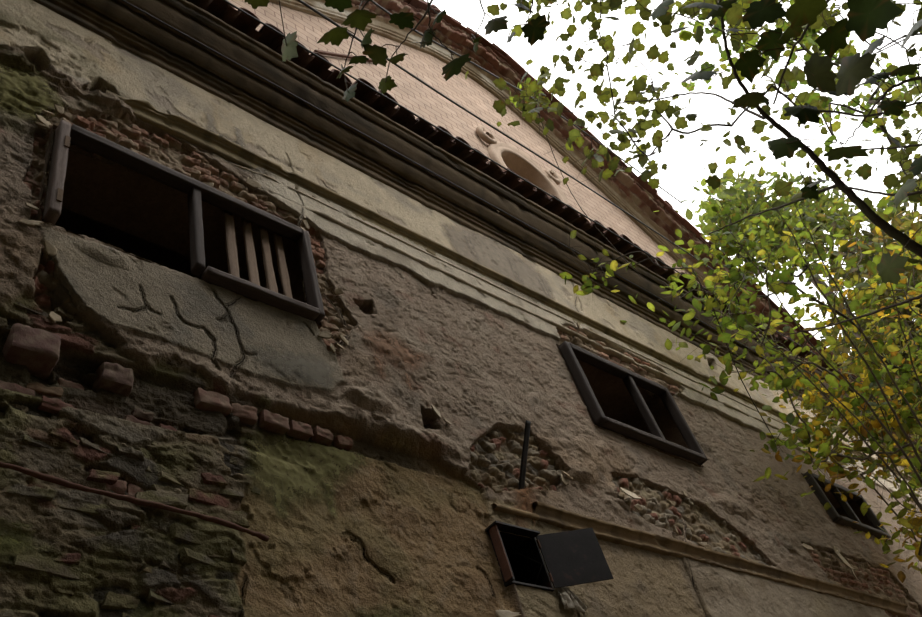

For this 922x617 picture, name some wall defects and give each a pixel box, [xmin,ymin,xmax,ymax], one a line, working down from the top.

spalling [18,104,355,353]
crack [118,286,256,377]
spalling [465,428,573,493]